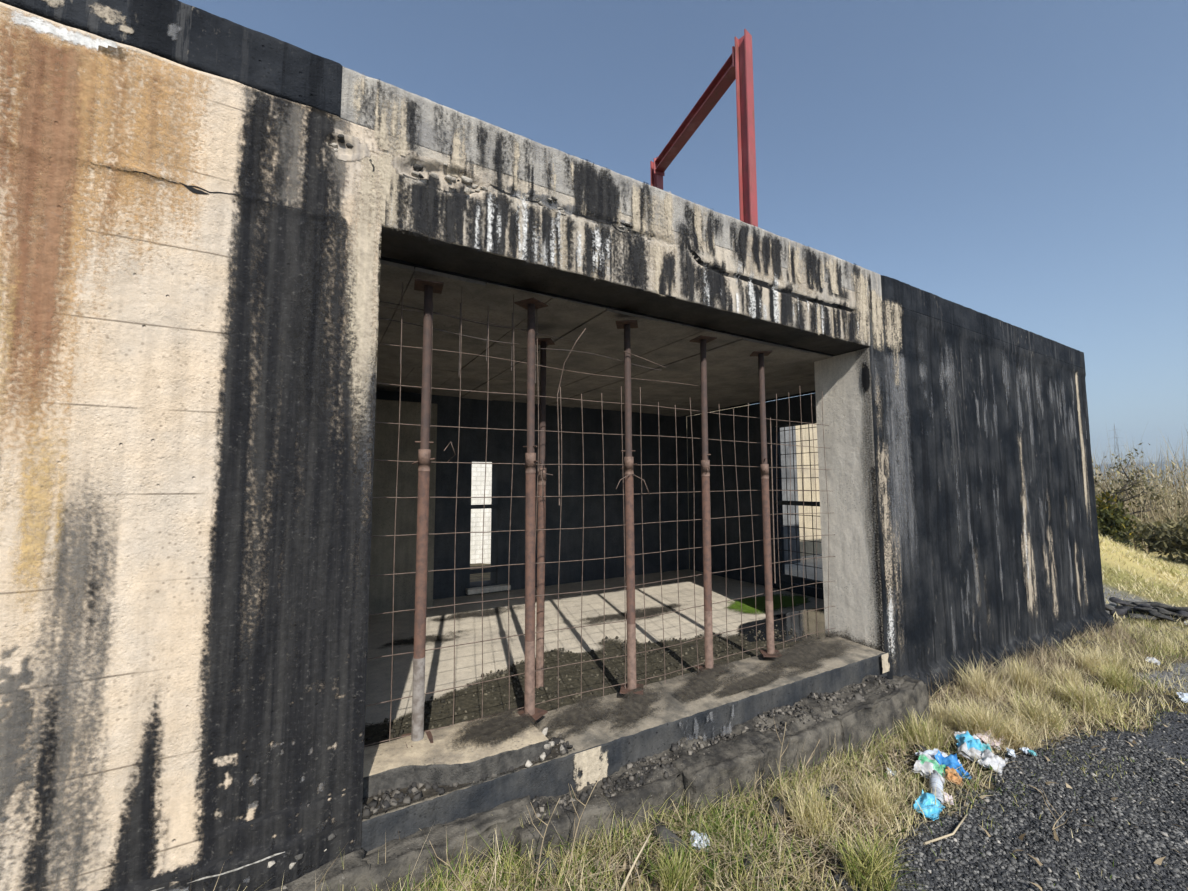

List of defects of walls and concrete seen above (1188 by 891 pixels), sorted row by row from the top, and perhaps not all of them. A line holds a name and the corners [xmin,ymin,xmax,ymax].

crack [76,158,238,196]
rust [0,7,208,595]
leakage [103,79,914,891]
crack [686,233,853,312]
leakage [941,347,954,400]
leakage [951,472,981,653]
leakage [976,356,1091,521]
leakage [7,480,115,891]